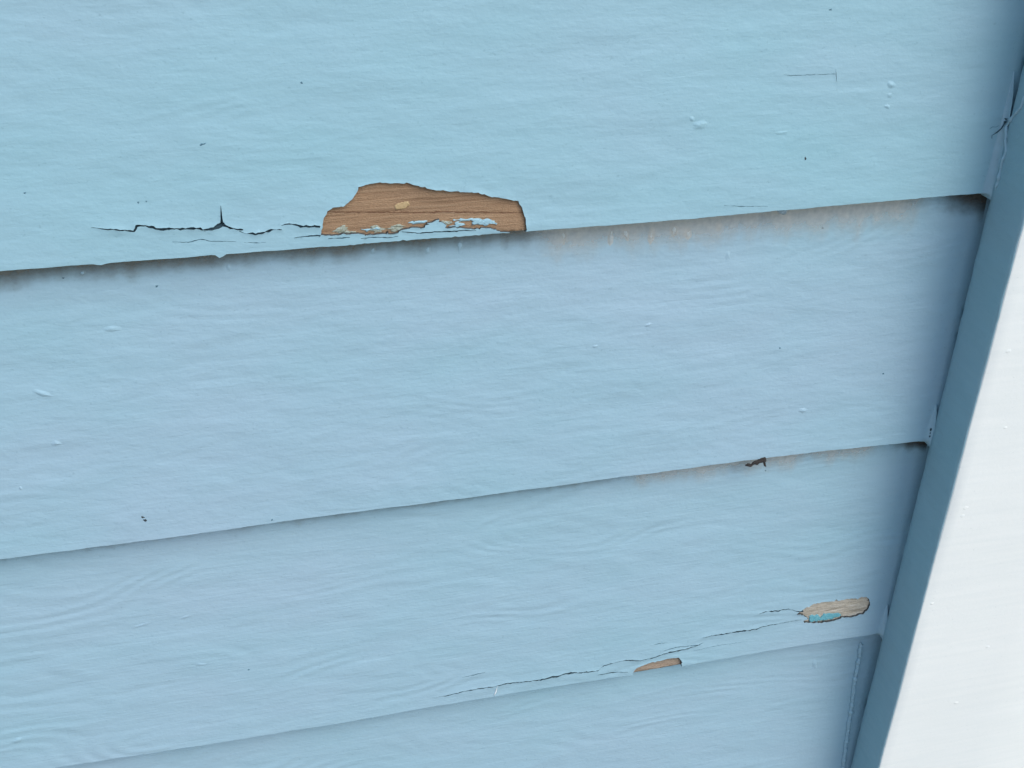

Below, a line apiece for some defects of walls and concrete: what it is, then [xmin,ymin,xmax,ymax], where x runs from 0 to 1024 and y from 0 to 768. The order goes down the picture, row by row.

crack [91,209,476,243]
peeling [321,182,527,236]
peeling [797,597,870,623]
crack [441,609,804,697]
peeling [634,658,682,672]